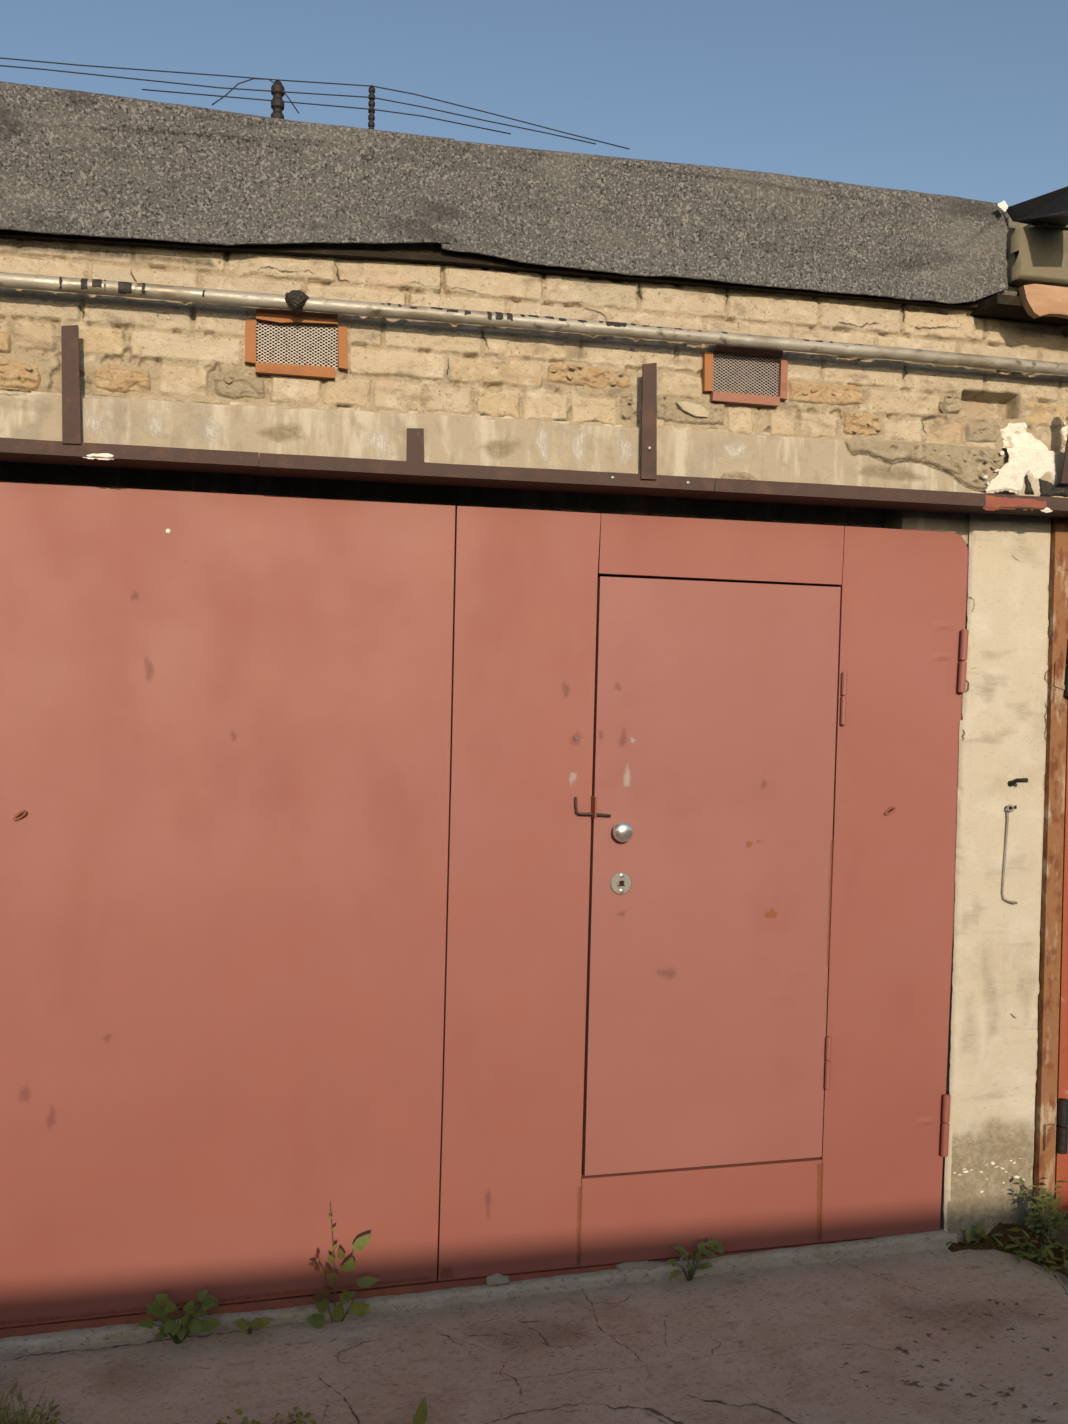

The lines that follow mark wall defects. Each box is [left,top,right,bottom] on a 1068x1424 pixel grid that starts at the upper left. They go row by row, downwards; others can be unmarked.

water stain [947,1126,1033,1243]
crack [286,1292,797,1424]